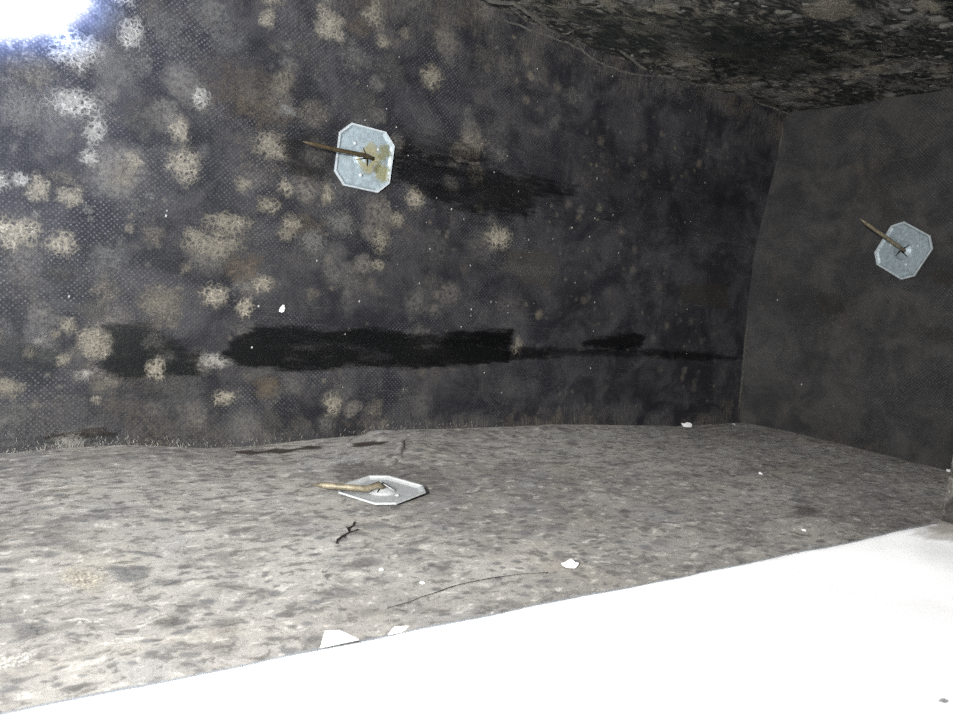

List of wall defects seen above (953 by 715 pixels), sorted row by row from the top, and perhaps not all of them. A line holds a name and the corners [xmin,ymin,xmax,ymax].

mould [1,0,143,163]
mould [192,67,296,161]
mould [317,1,380,70]
water stain [421,58,450,89]
mould [167,151,197,182]
water stain [393,109,571,216]
mould [0,174,93,254]
water stain [55,214,728,403]